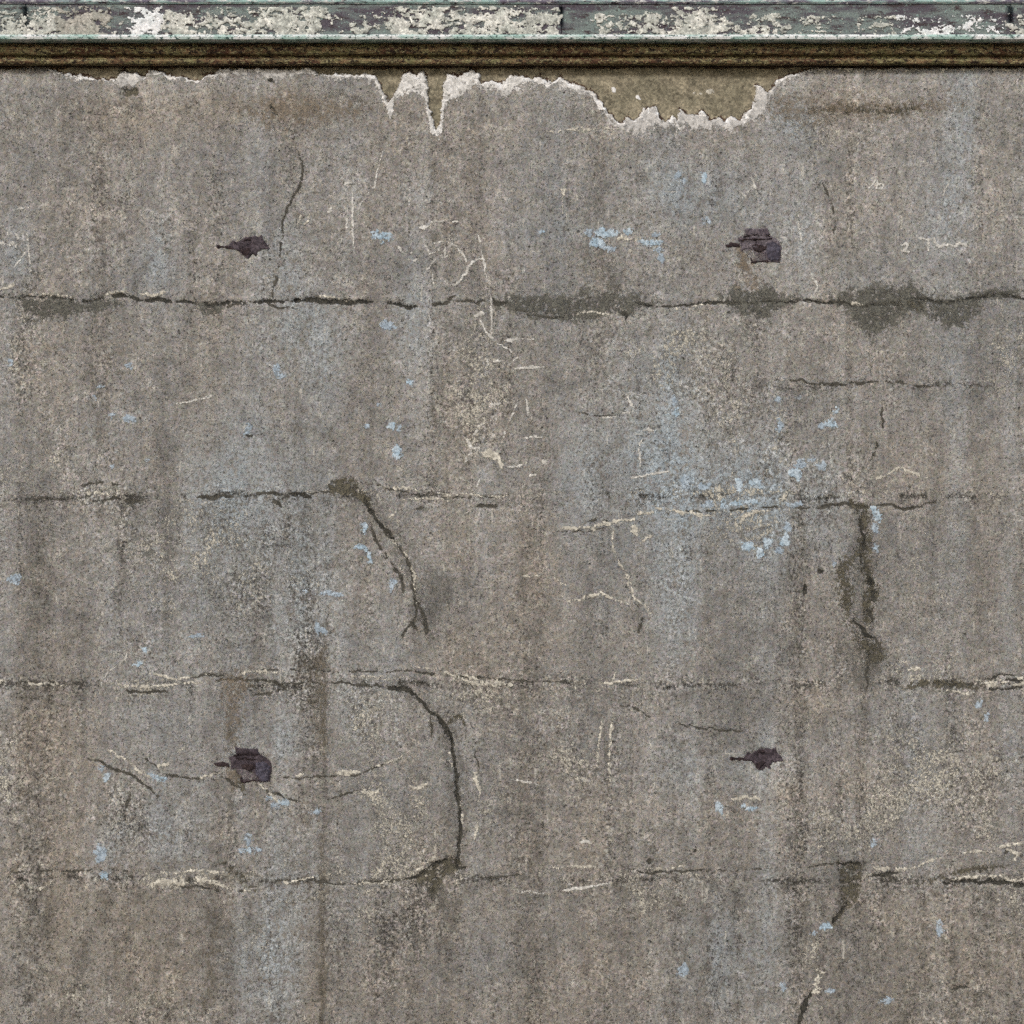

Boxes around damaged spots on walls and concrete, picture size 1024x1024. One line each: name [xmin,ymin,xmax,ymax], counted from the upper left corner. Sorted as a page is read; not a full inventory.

spalling [49,65,920,140]
crack [0,149,1024,320]
damp [830,278,1019,344]
crack [2,481,144,505]
crack [196,476,504,638]
crack [516,499,937,692]
damp [833,554,890,667]
crack [902,666,1024,695]
crack [0,652,579,879]
crack [545,849,796,875]
crack [868,842,1024,888]
crack [798,969,826,1024]